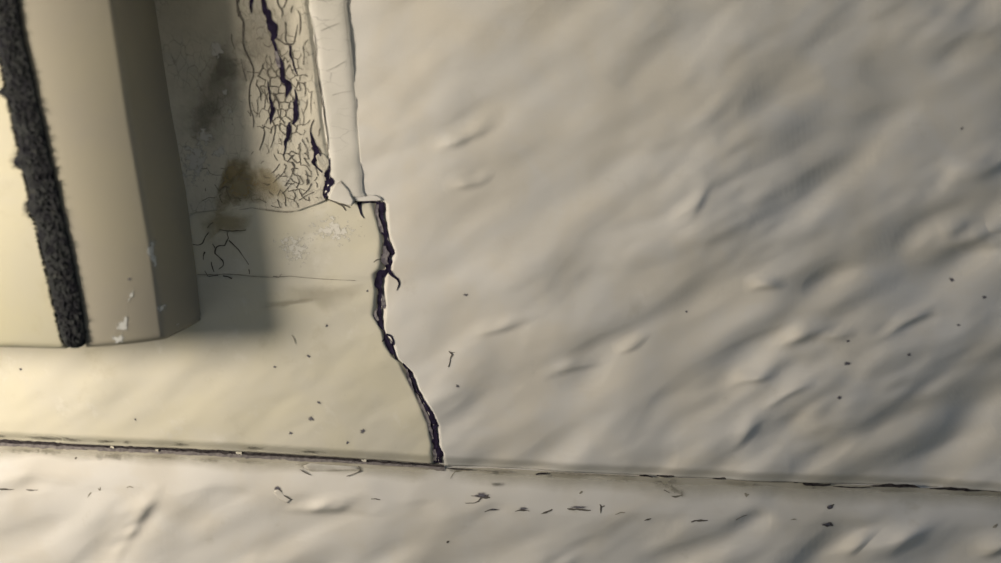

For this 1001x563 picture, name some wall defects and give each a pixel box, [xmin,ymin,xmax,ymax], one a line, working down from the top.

crack [193,0,444,463]